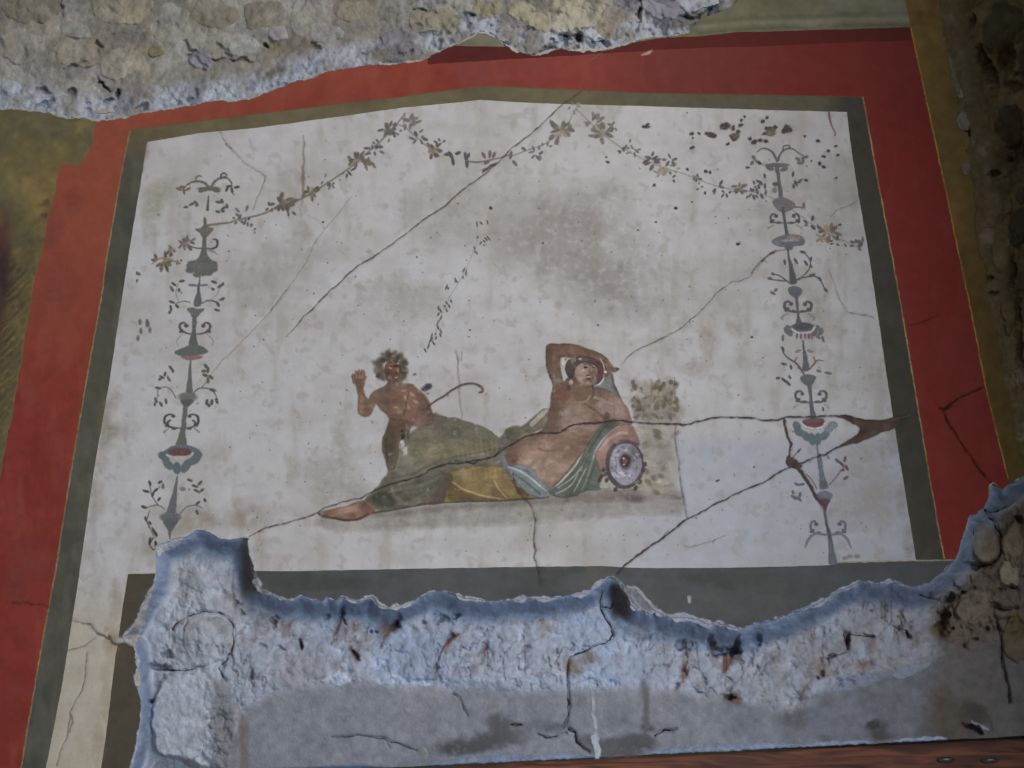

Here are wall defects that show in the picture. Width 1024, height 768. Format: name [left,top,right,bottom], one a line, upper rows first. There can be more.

flaking render [123,476,1024,768]